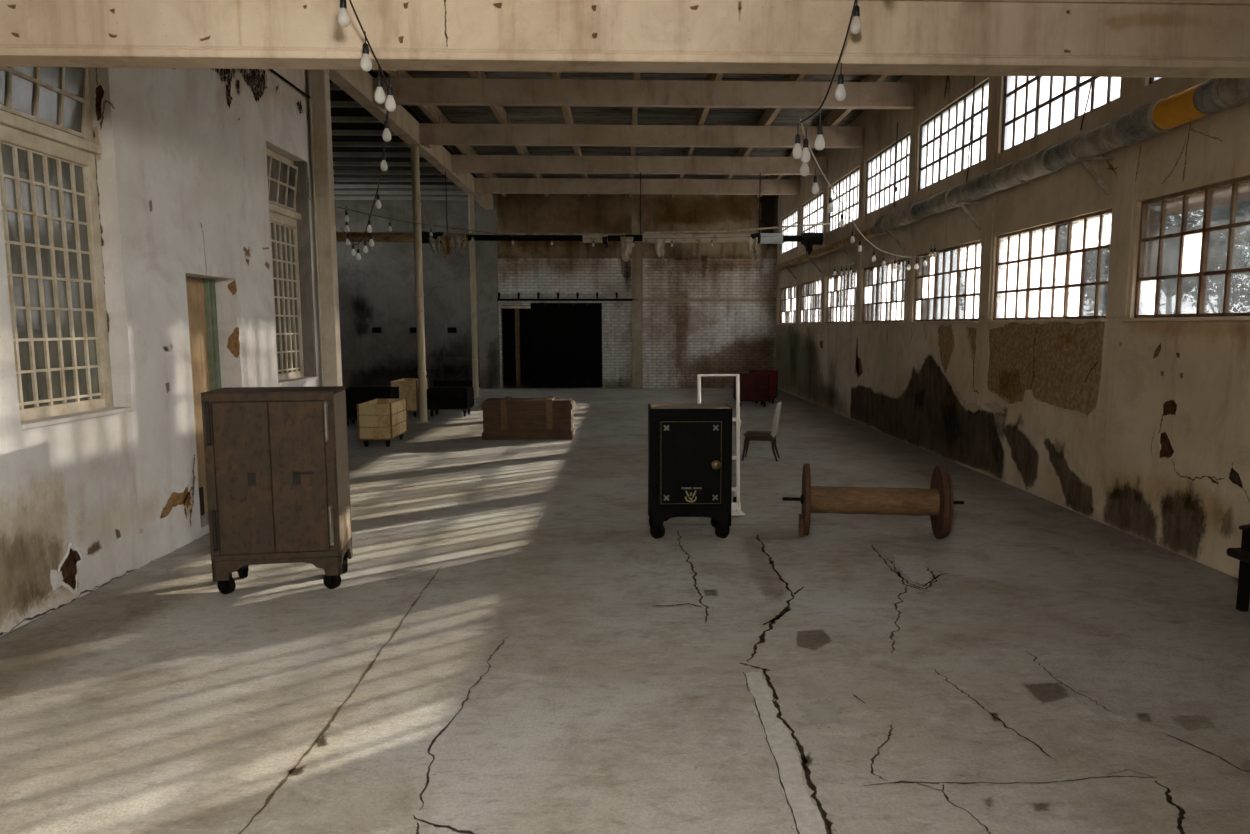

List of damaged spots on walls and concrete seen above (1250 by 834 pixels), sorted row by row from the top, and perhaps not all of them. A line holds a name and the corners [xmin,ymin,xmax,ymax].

peeling [212,68,279,120]
spalling [937,317,1121,419]
spalling [156,482,194,525]
water stain [850,356,1205,557]
spalling [1151,398,1178,462]
spalling [50,541,100,595]
crack [656,531,709,623]
crack [871,545,948,654]
crack [740,535,833,834]
crack [413,638,506,834]
crack [870,724,991,834]
crack [1108,769,1185,834]